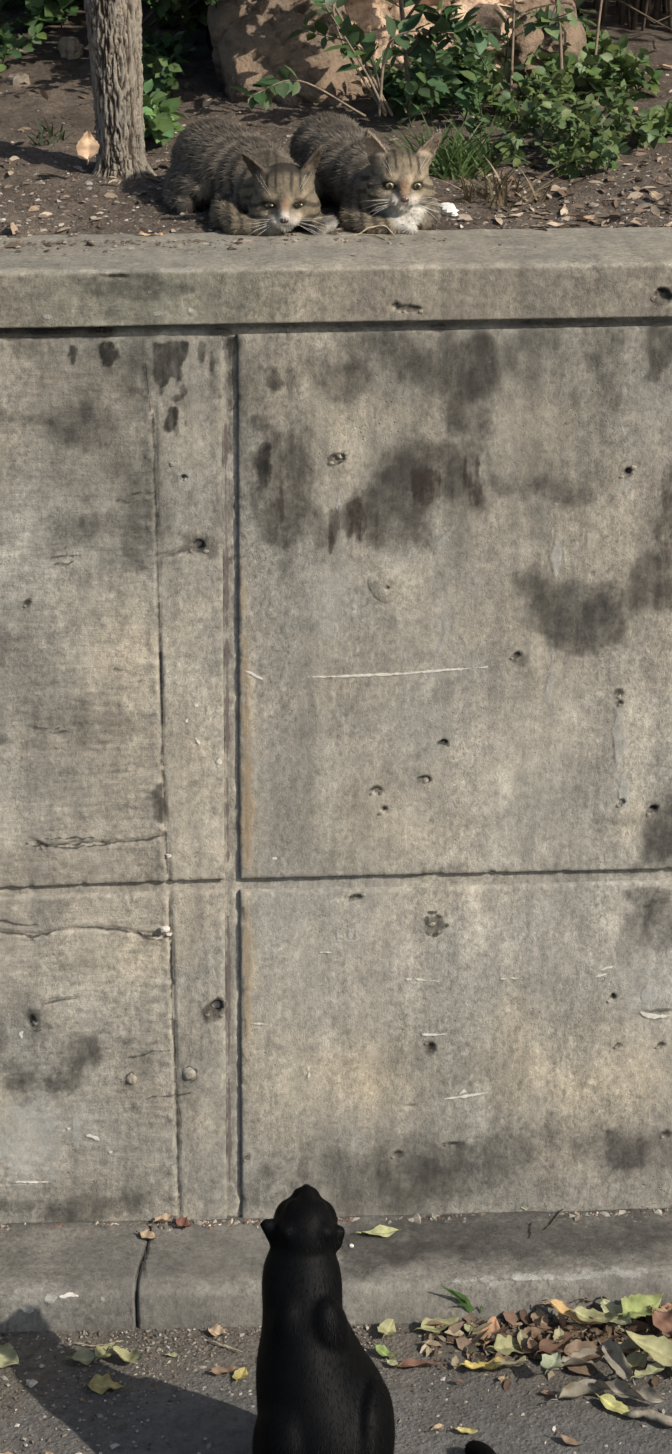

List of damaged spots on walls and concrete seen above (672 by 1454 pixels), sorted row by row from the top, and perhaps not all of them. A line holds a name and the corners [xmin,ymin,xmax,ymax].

water stain [154,337,236,432]
water stain [254,434,318,547]
water stain [337,446,485,543]
crack [0,368,191,1198]
crack [137,1247,150,1330]